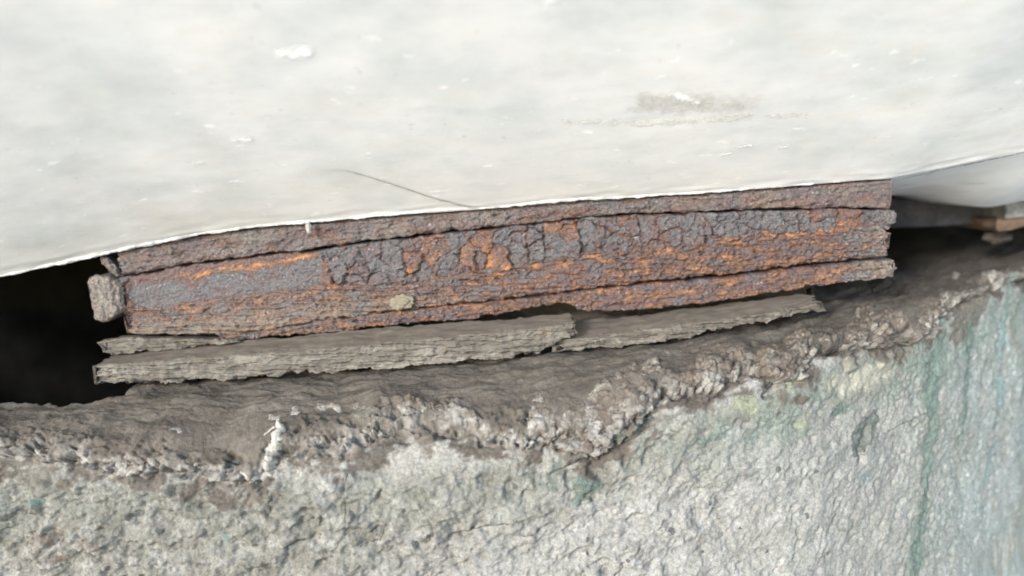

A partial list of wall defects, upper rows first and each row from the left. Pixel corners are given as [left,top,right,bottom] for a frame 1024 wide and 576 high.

rust [100,253,131,277]
rust [92,294,826,385]
spalling [682,321,817,394]
damp [909,287,989,576]